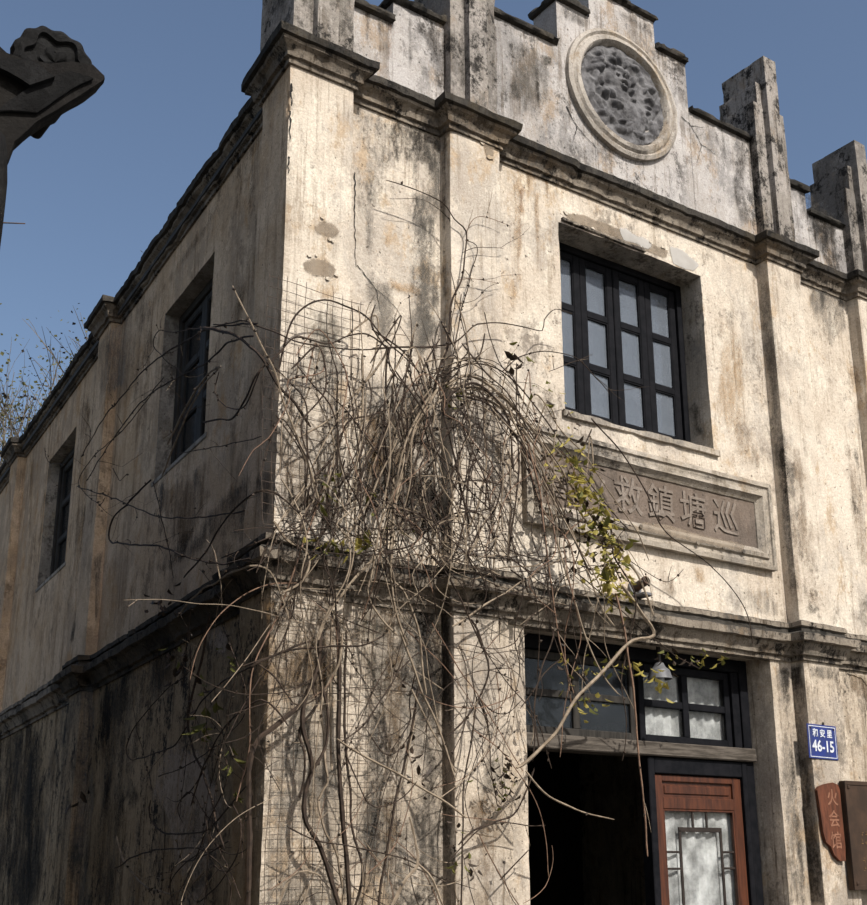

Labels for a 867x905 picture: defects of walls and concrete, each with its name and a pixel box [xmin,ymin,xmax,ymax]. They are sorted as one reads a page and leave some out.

crack [286,83,294,173]
crack [354,172,400,314]
spalling [564,210,668,258]
damp [735,137,762,220]
damp [761,296,777,413]
damp [773,424,800,521]
damp [0,727,43,905]
damp [62,650,180,905]